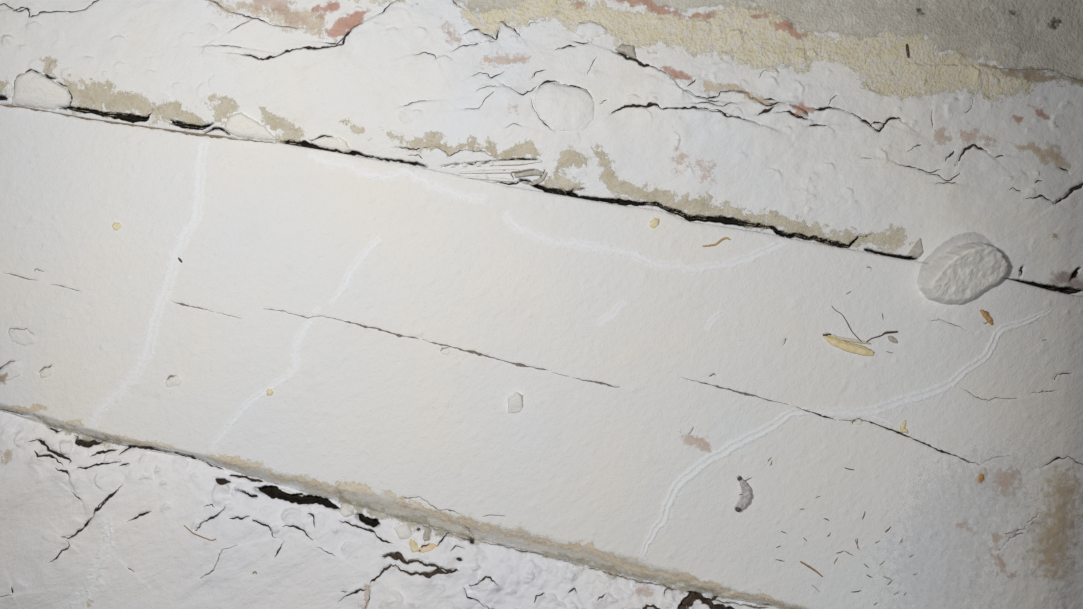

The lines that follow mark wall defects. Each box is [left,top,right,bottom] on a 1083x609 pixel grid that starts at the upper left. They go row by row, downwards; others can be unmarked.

crack [12,69,73,107]
peeling [39,56,239,131]
peeling [210,0,324,35]
peeling [259,107,305,144]
peeling [386,131,540,161]
peeling [455,0,1083,103]
crack [307,135,791,275]
peeling [544,145,913,254]
crack [29,137,211,562]
crack [210,235,382,451]
crack [338,307,1069,609]
crack [194,504,335,556]